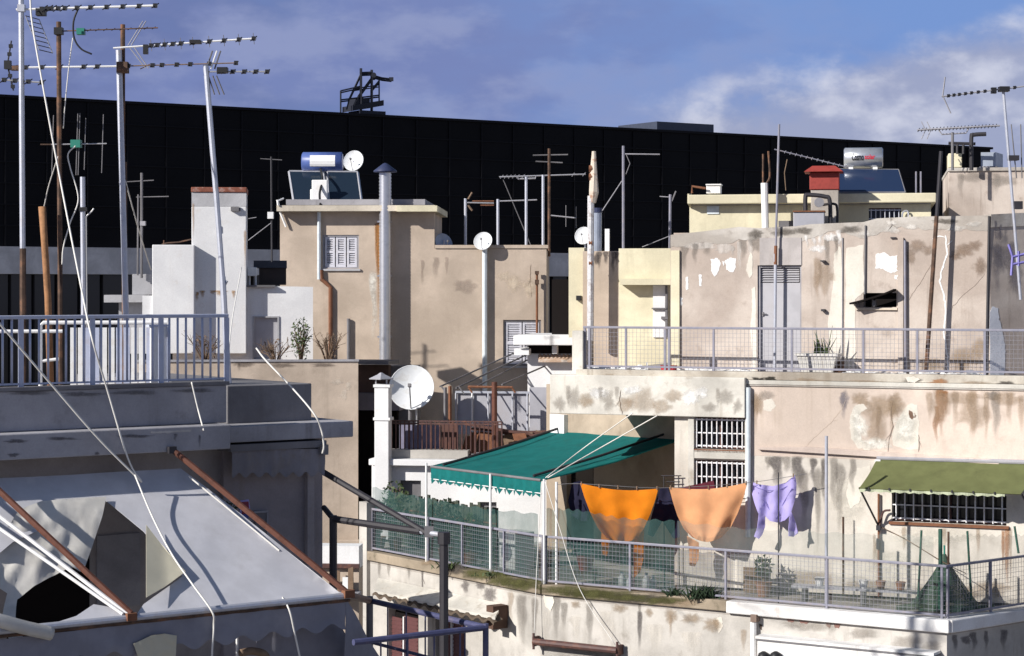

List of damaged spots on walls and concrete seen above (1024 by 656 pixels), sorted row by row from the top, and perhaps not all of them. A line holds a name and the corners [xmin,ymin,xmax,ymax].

peeling [680,251,756,371]
peeling [828,245,898,372]
flaking render [850,404,871,451]
flaking render [891,403,919,450]
leakage [770,457,825,486]